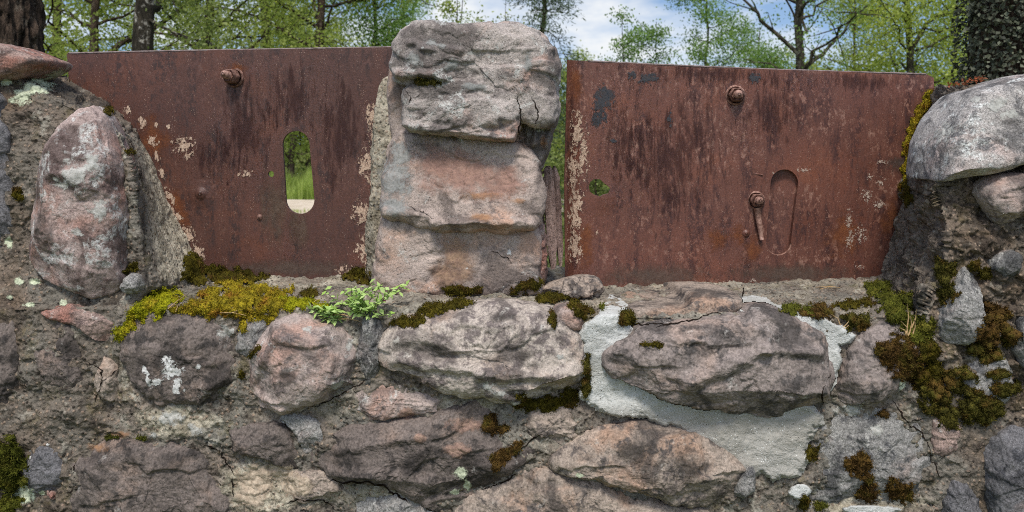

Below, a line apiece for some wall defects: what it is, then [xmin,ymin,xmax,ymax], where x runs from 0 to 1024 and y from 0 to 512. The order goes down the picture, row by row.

peeling [123,106,206,259]
peeling [334,103,375,274]
crack [517,97,539,140]
peeling [567,83,616,263]
crack [629,312,721,327]